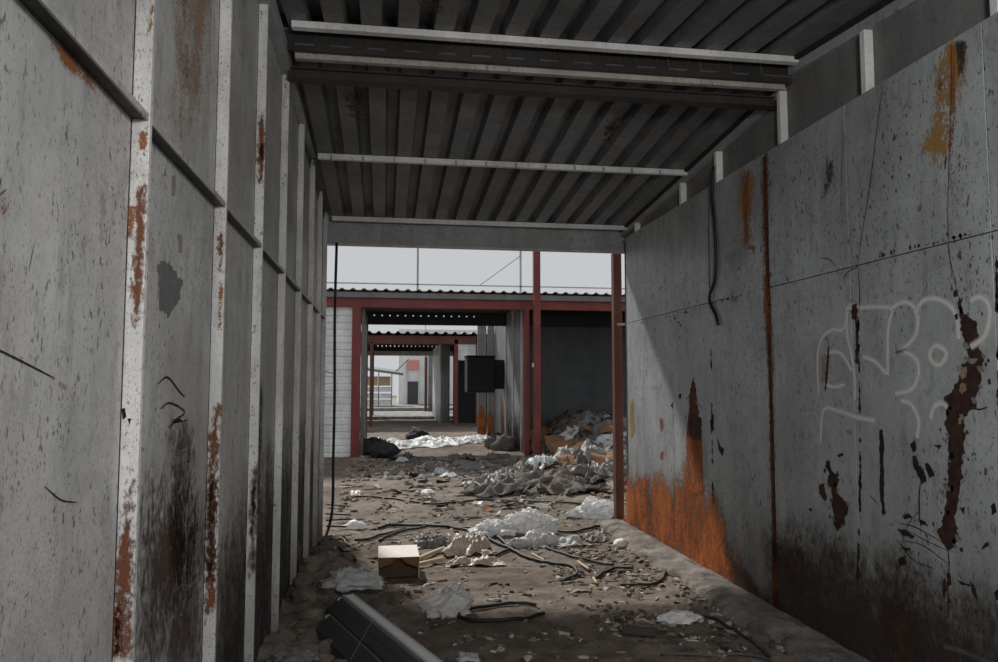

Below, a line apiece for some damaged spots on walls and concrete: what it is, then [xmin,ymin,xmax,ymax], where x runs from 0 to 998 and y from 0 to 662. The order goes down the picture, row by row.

corrosion [138,131,148,150]
corrosion [922,37,968,189]
corrosion [128,184,147,328]
corrosion [113,390,319,662]
corrosion [622,153,781,611]
peeling [819,429,886,540]
peeling [851,303,861,413]
peeling [896,290,998,617]